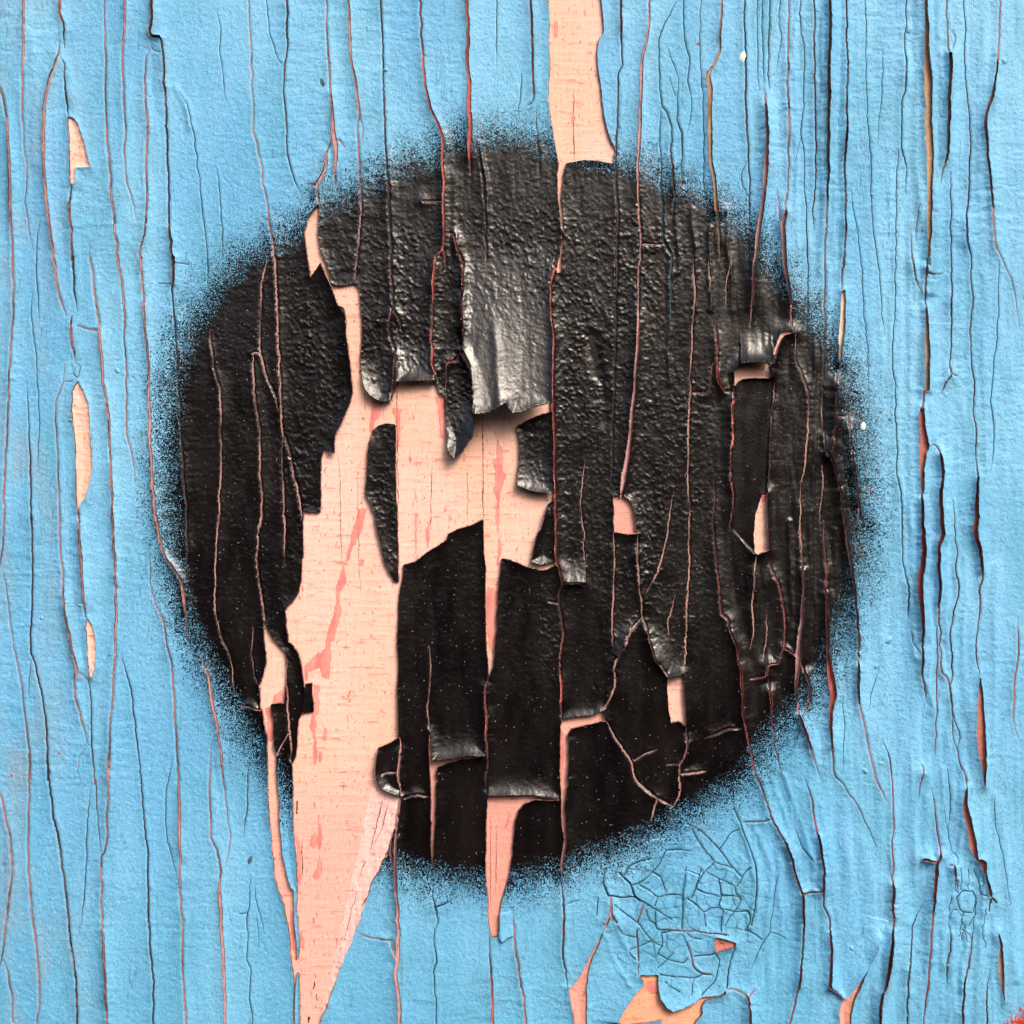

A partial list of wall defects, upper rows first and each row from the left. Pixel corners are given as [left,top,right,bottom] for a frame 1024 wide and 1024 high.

peeling [68,117,89,184]
crack [419,0,487,394]
crack [493,0,501,64]
crack [518,0,540,173]
peeling [734,319,792,385]
peeling [71,382,92,512]
crack [0,0,402,1024]
peeling [260,0,615,1024]
peeling [753,493,768,554]
crack [560,0,1020,1024]
peeling [919,408,929,491]
peeling [568,927,725,1024]